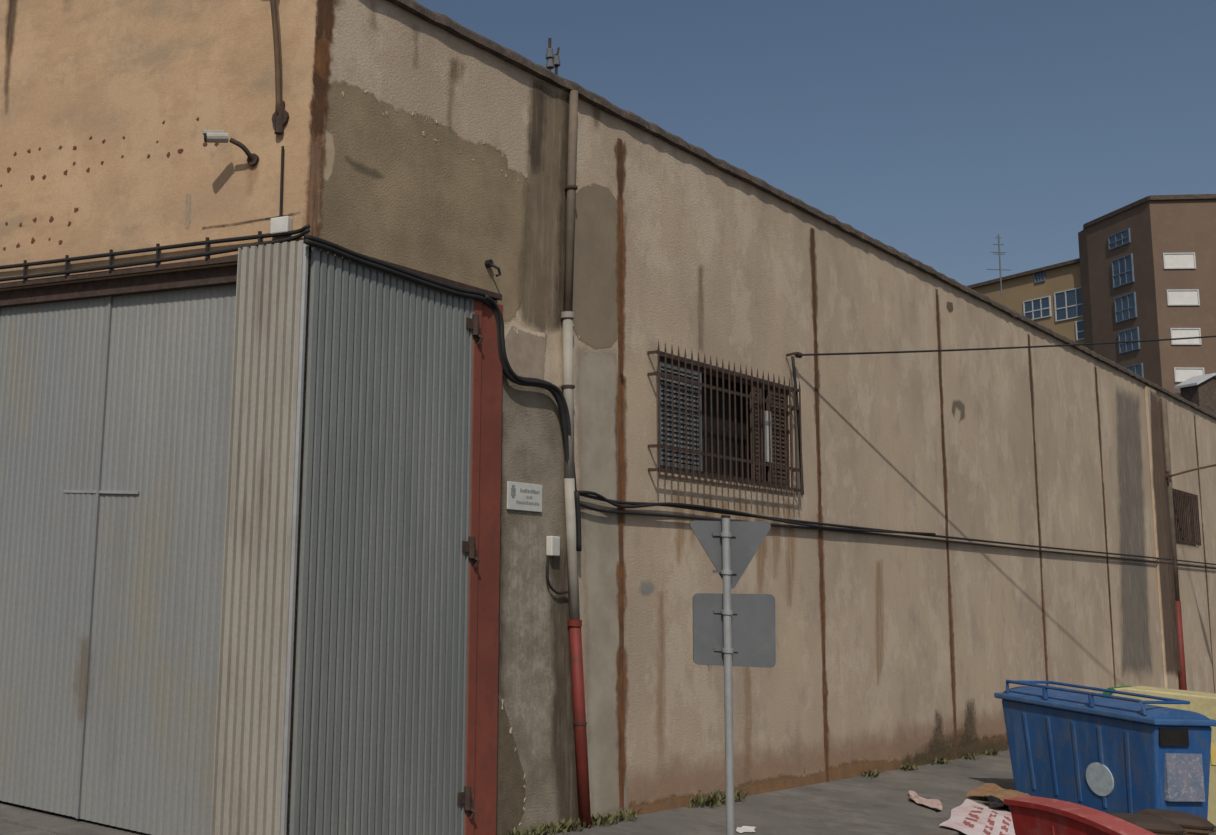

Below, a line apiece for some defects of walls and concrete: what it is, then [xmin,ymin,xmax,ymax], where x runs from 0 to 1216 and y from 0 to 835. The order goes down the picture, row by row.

leakage [5,0,16,91]
corrosion [306,0,334,237]
leakage [522,83,569,331]
peeling [318,81,709,835]
corrosion [614,142,627,526]
corrosion [617,562,626,627]
corrosion [810,229,829,781]
leakage [1117,392,1180,672]
corrosion [616,648,628,797]
flaking render [734,733,1008,797]